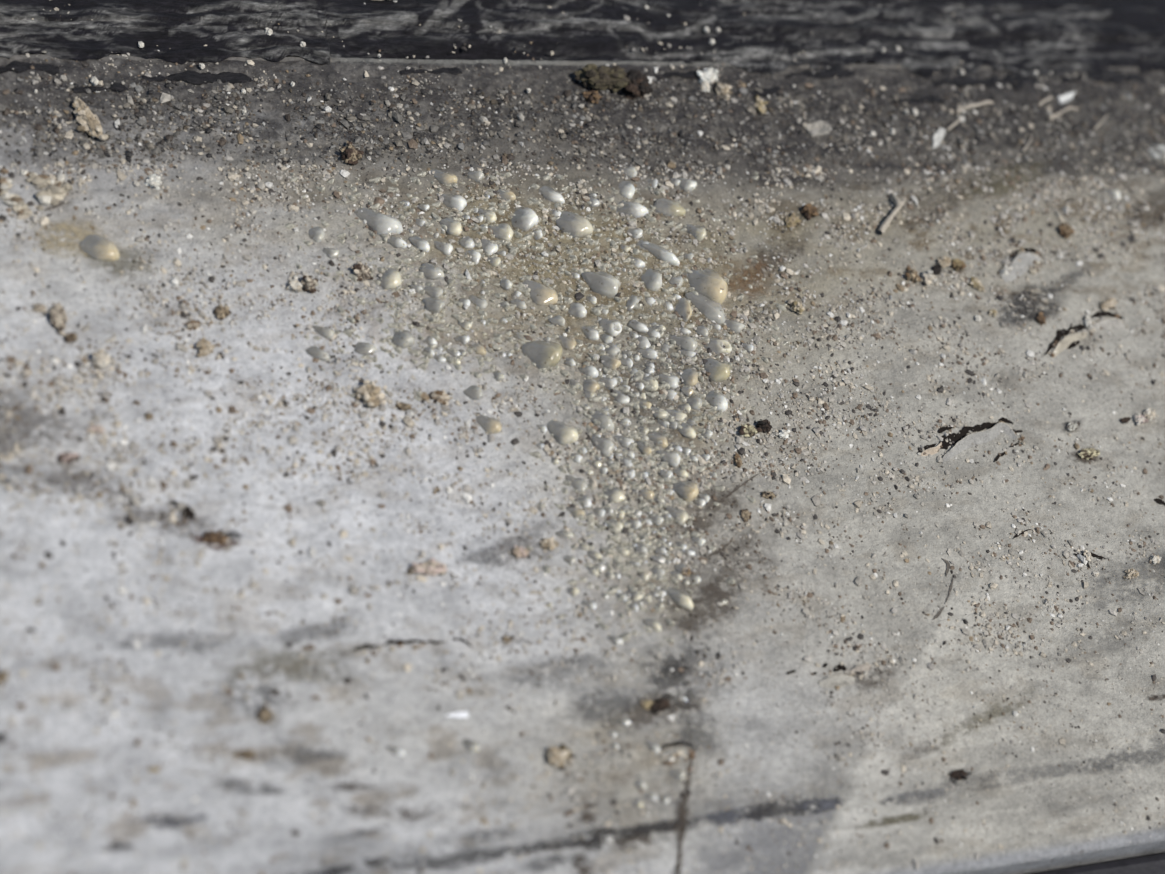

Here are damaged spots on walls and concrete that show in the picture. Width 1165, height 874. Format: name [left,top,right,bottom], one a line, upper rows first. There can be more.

crack [1043,308,1128,358]
leakage [680,491,738,532]
leakage [671,583,734,630]